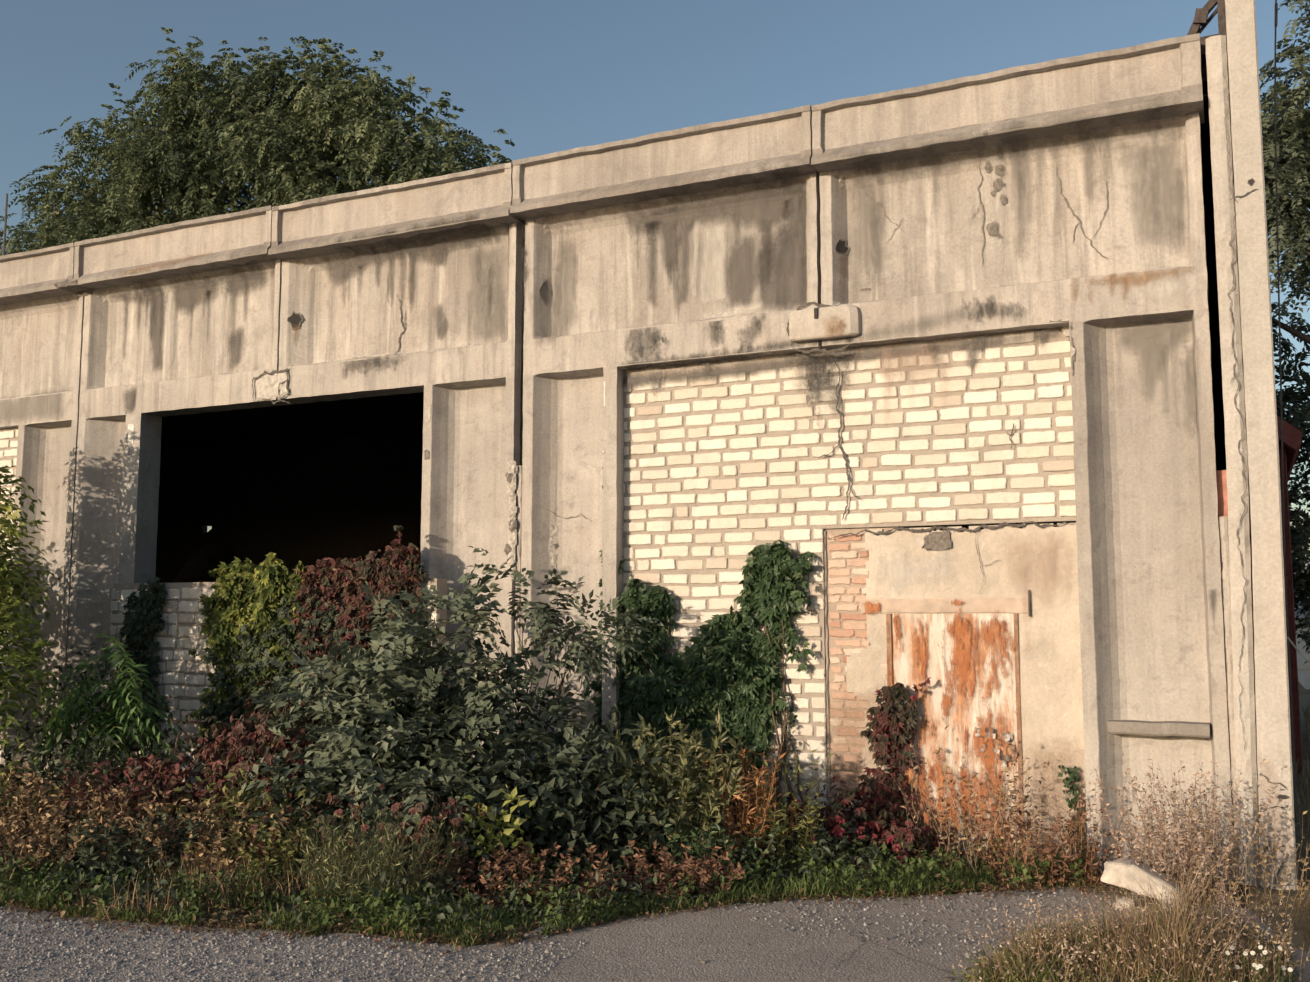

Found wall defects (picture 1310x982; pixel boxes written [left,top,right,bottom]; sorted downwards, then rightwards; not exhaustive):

leakage [117,265,265,369]
leakage [330,355,393,369]
leakage [326,216,509,299]
leakage [437,308,445,337]
leakage [623,175,1054,410]
crack [971,150,985,265]
peeling [983,131,1007,239]
crack [1056,167,1108,259]
crack [786,301,1072,594]
spalling [504,461,518,582]
corrosion [865,601,880,614]
corrosion [887,599,1019,857]